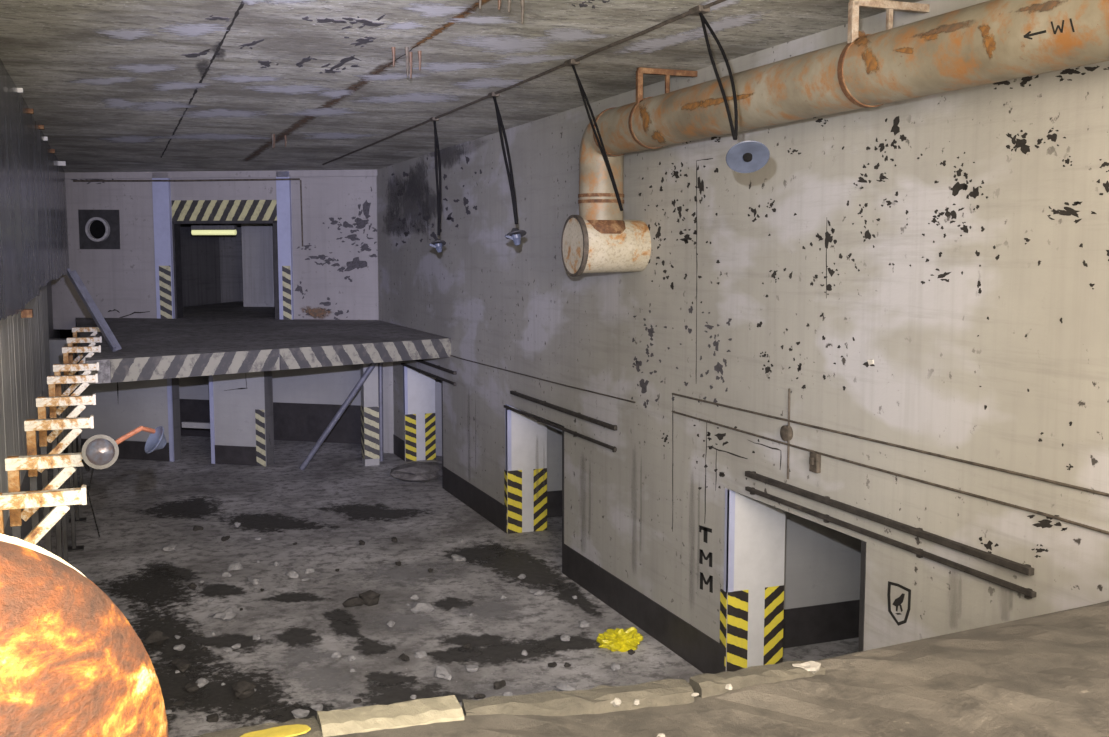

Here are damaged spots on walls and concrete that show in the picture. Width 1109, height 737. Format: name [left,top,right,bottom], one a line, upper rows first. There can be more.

rust [413,0,489,47]
crack [161,0,245,158]
peeling [1006,128,1066,154]
peeling [297,188,378,282]
peeling [639,162,718,290]
peeling [802,221,860,295]
peeling [1047,201,1096,223]
damp [138,562,247,598]
damp [180,626,322,653]
damp [264,592,396,656]
damp [434,597,474,610]
damp [357,672,475,706]